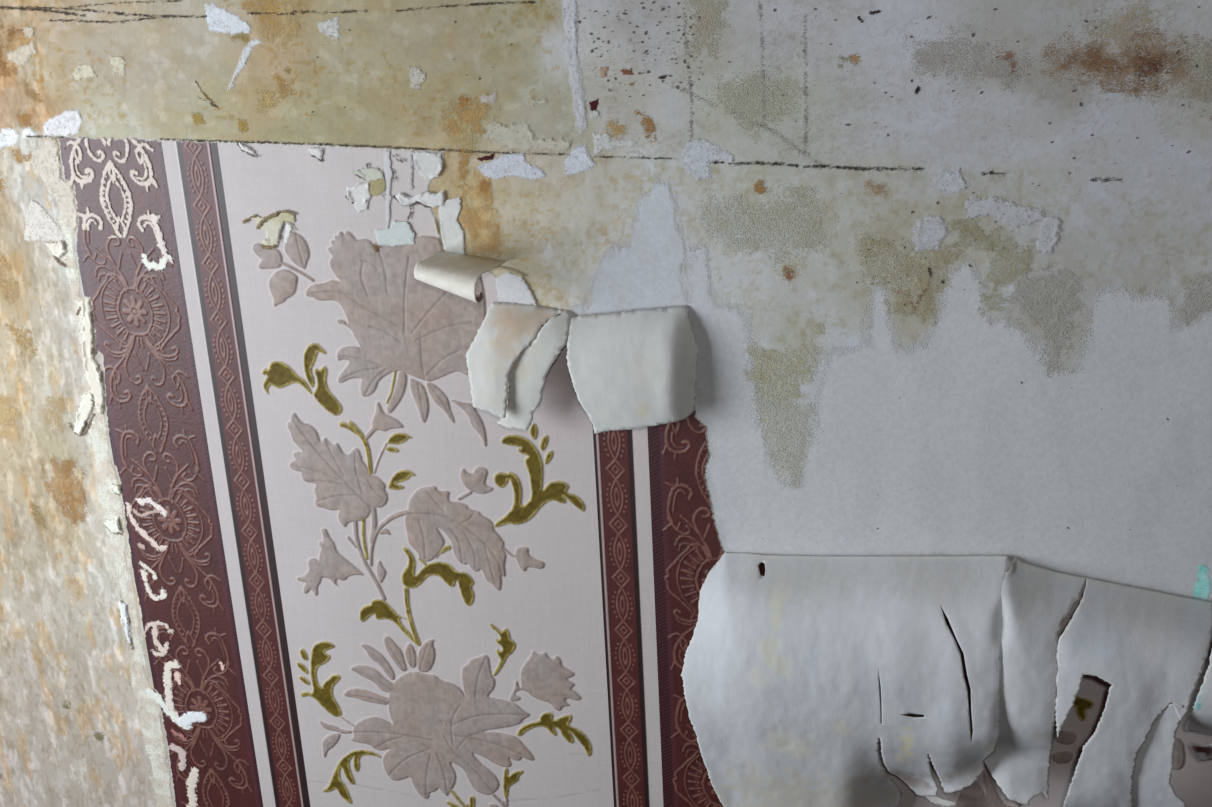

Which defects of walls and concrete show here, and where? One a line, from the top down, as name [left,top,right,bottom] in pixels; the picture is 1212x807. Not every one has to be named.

rust [1039,0,1201,107]
peeling [45,240,67,268]
water stain [978,238,1089,378]
peeling [68,298,105,437]
water stain [742,322,824,491]
peeling [104,517,122,535]
peeling [118,600,133,651]